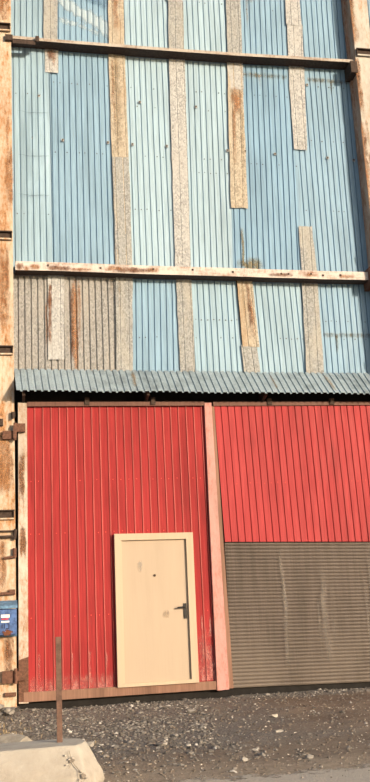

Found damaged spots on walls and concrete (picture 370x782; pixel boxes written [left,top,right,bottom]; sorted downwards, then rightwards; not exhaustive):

rust [231,93,243,136]
rust [361,124,370,206]
rust [70,287,80,362]